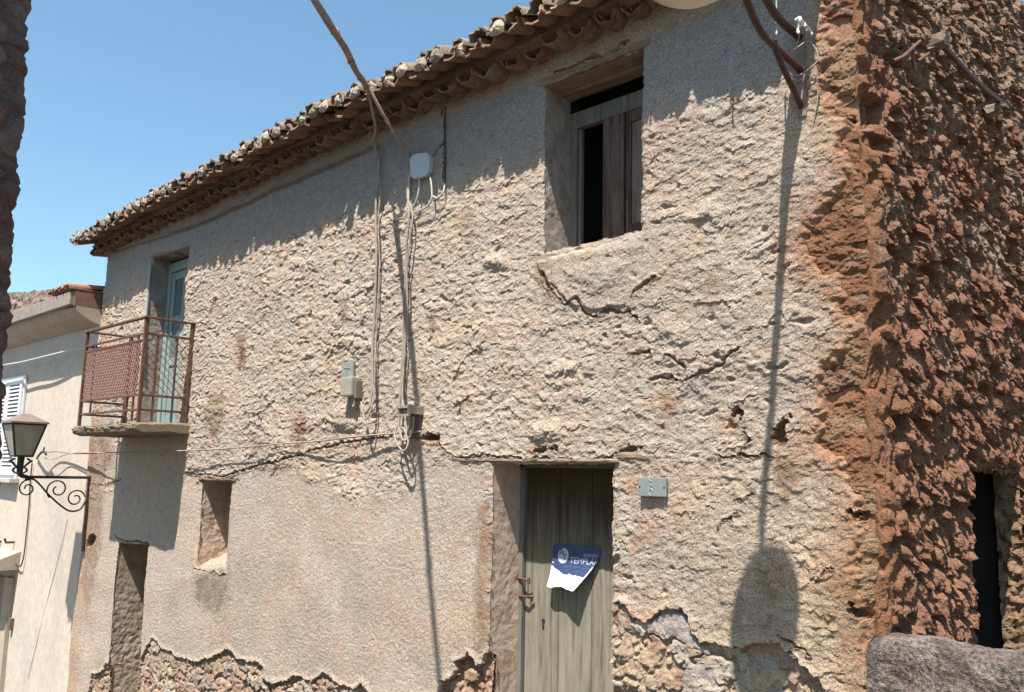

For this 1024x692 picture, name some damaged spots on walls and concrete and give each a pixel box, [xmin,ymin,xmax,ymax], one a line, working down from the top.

crack [541,271,656,322]
flaking render [806,0,880,640]
crack [628,346,739,384]
crack [186,435,393,483]
crack [718,428,774,459]
hole [776,422,789,446]
spalling [92,665,111,692]
spalling [139,639,368,692]
spalling [444,653,496,692]
spalling [610,602,825,692]